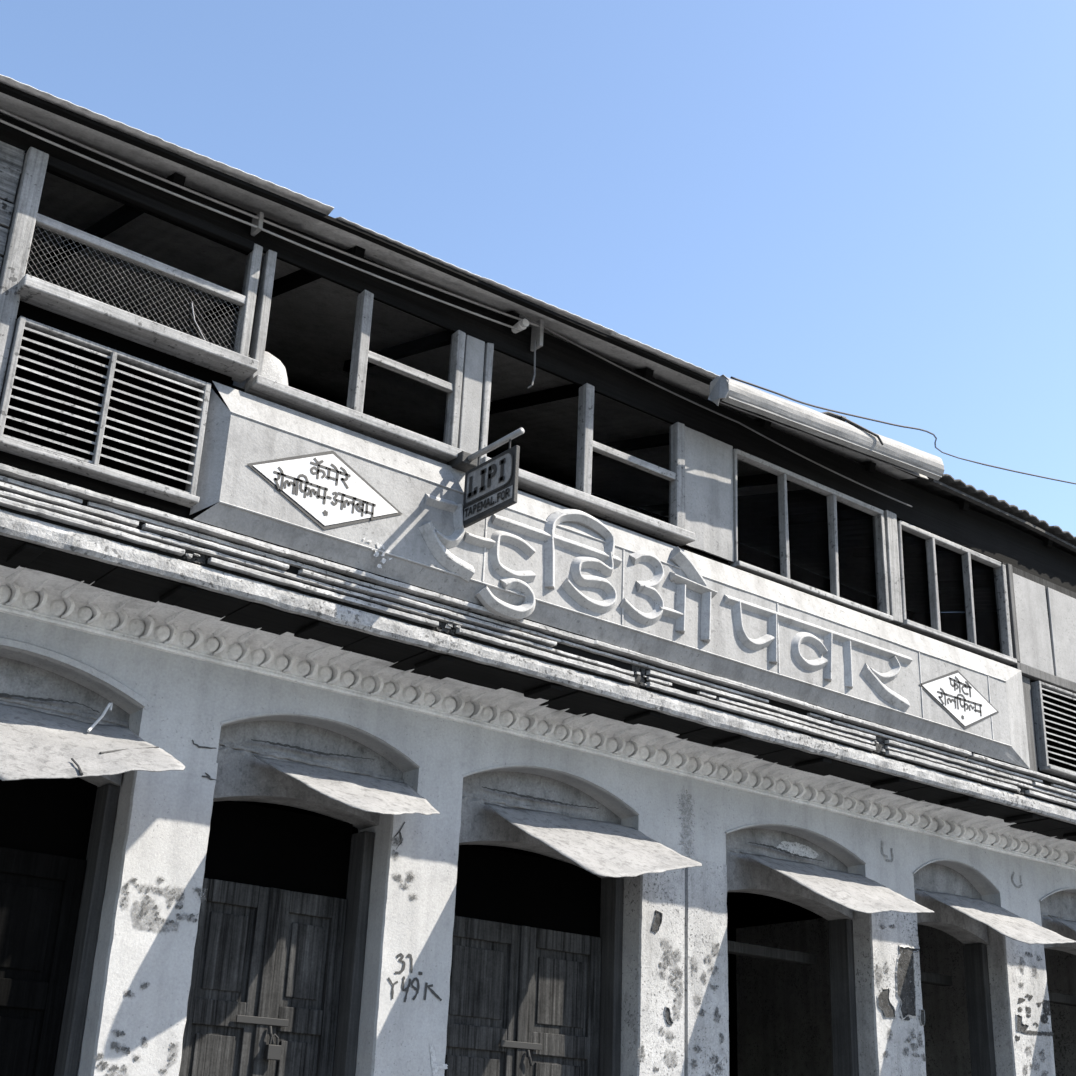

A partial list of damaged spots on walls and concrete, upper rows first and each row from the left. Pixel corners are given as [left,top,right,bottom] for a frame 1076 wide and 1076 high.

peeling [121,878,206,932]
peeling [96,1030,147,1076]
peeling [638,910,724,1072]
spalling [875,945,926,1062]
spalling [1015,952,1054,1076]